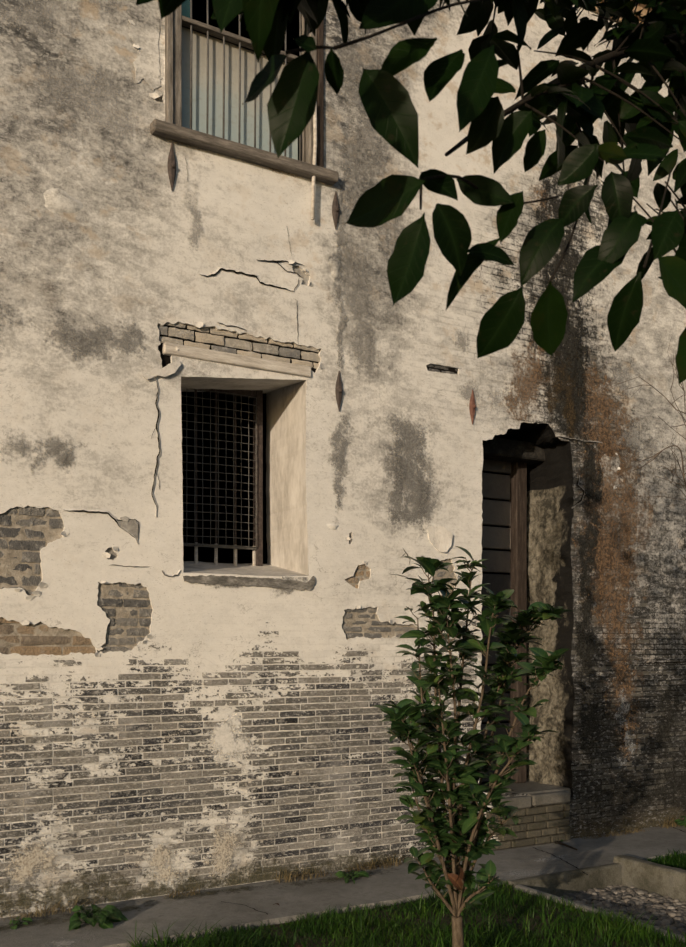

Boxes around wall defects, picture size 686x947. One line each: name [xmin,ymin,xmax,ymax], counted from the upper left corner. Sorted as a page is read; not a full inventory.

water stain [45,322,145,358]
crack [199,228,304,346]
crack [63,376,181,577]
water stain [384,414,437,526]
water stain [524,168,609,772]
spalling [0,506,69,600]
spalling [345,561,370,589]
peeling [0,579,477,918]
water stain [588,676,686,821]